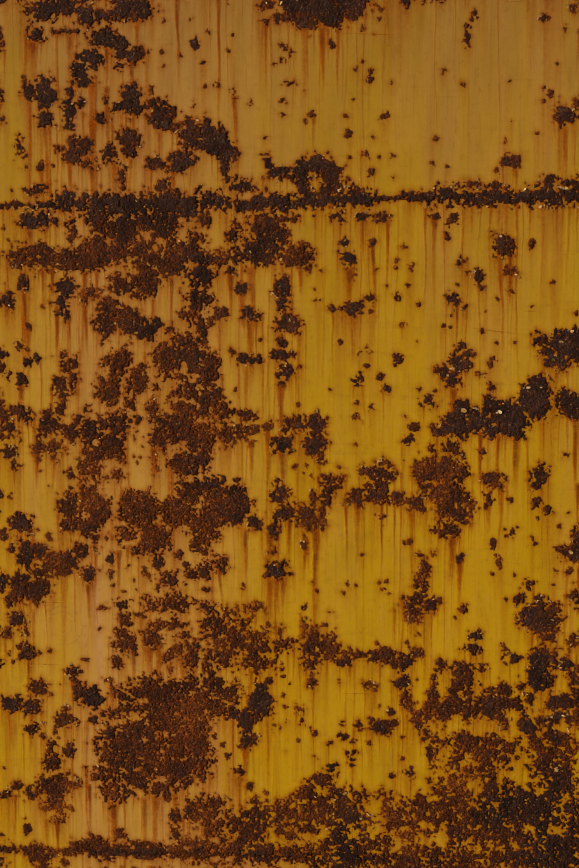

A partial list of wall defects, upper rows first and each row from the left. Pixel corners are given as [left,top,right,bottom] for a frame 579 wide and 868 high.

rust [255,0,385,73]
rust [398,0,446,11]
rust [462,8,479,49]
rust [353,59,374,84]
rust [541,85,579,159]
rust [327,235,379,319]
rust [23,352,43,368]
rust [339,324,579,585]
rust [262,462,348,617]
rust [326,720,359,768]
rust [230,765,246,787]
rust [388,765,416,790]